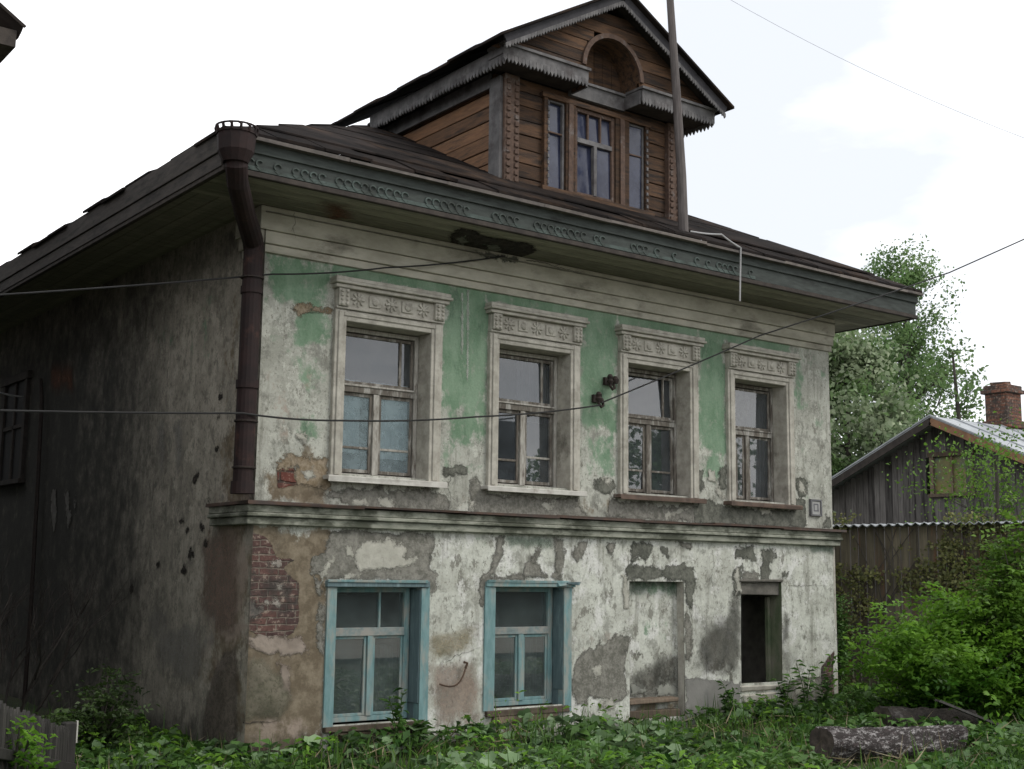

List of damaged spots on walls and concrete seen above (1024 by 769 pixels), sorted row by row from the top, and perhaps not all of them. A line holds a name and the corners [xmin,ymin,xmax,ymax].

flaking render [293,302,333,317]
flaking render [275,431,450,510]
flaking render [442,464,587,516]
flaking render [179,517,439,697]
flaking render [478,535,588,607]
flaking render [621,540,697,661]
flaking render [732,544,789,596]
flaking render [571,633,631,710]
flaking render [785,651,835,707]